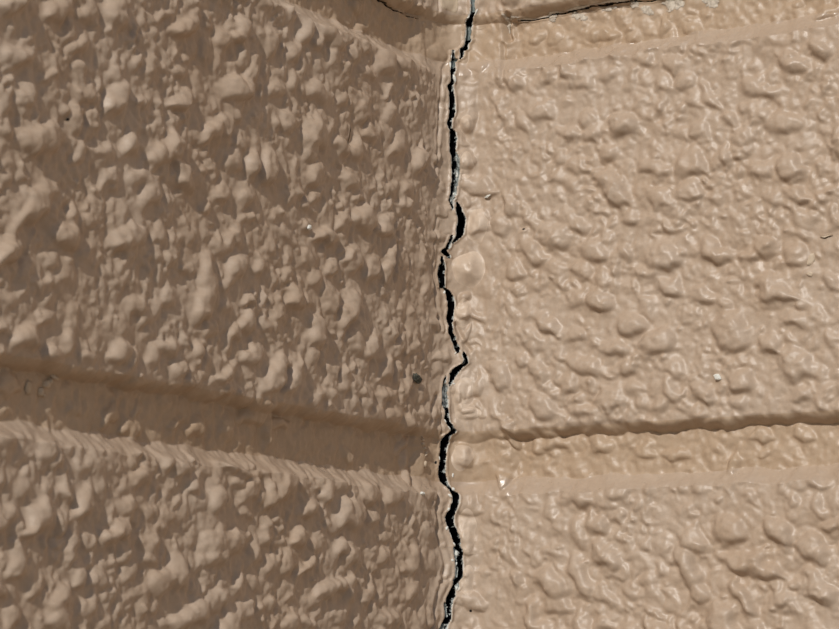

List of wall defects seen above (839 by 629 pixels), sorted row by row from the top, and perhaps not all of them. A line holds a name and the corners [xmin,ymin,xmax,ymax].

crack [437,0,478,629]
crack [517,0,656,21]